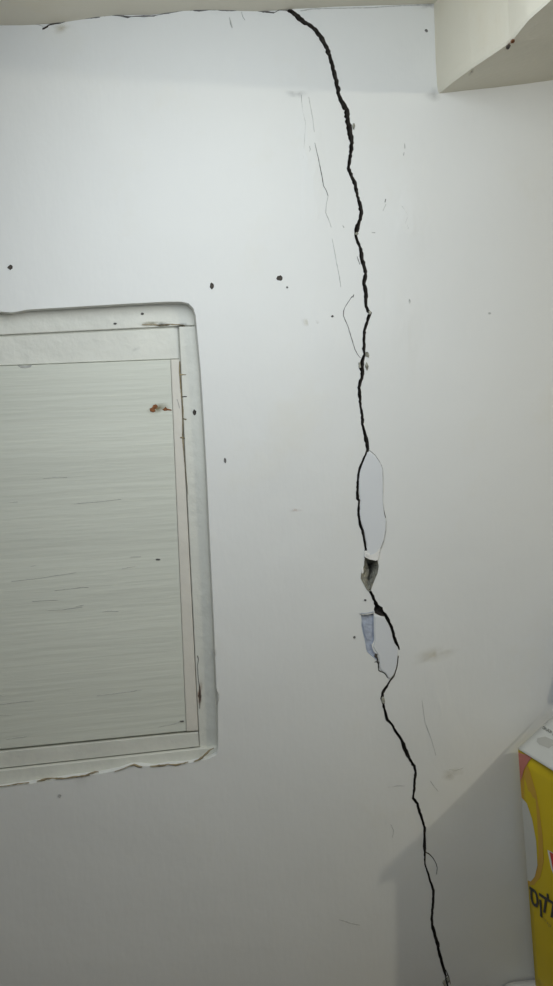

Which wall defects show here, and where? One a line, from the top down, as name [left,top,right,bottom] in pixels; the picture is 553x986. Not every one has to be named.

crack [87,9,404,552]
peeling [359,452,386,591]
peeling [359,611,398,679]
crack [369,589,462,986]